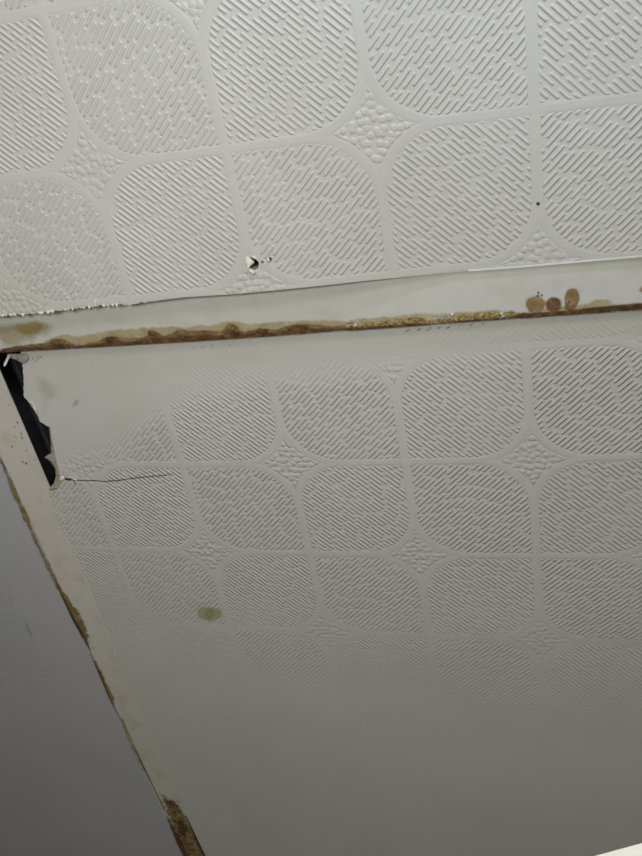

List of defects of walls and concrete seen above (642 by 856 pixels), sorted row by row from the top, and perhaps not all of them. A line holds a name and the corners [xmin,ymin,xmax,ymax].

rust [0,289,642,353]
spalling [4,353,39,366]
spalling [45,427,65,490]
crack [64,474,171,485]
water stain [199,608,220,620]
rust [0,459,206,856]